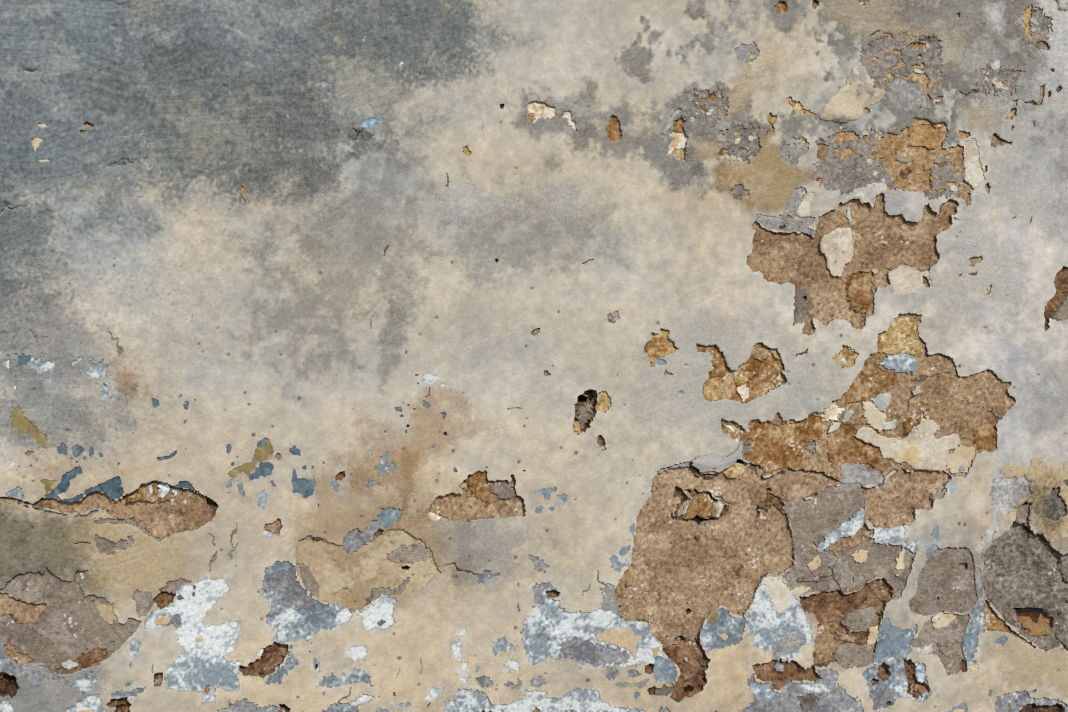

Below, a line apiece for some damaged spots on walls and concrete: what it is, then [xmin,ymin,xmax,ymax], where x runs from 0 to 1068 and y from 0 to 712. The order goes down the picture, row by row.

water stain [300,30,404,124]
water stain [157,85,264,175]
spalling [666,85,777,164]
spalling [746,31,1025,336]
spalling [1044,267,1068,330]
peeling [4,353,57,383]
peeling [395,400,447,436]
spalling [0,405,218,555]
peeling [226,437,325,509]
peeling [331,471,352,492]
spalling [425,313,1068,712]
spalling [0,507,441,712]